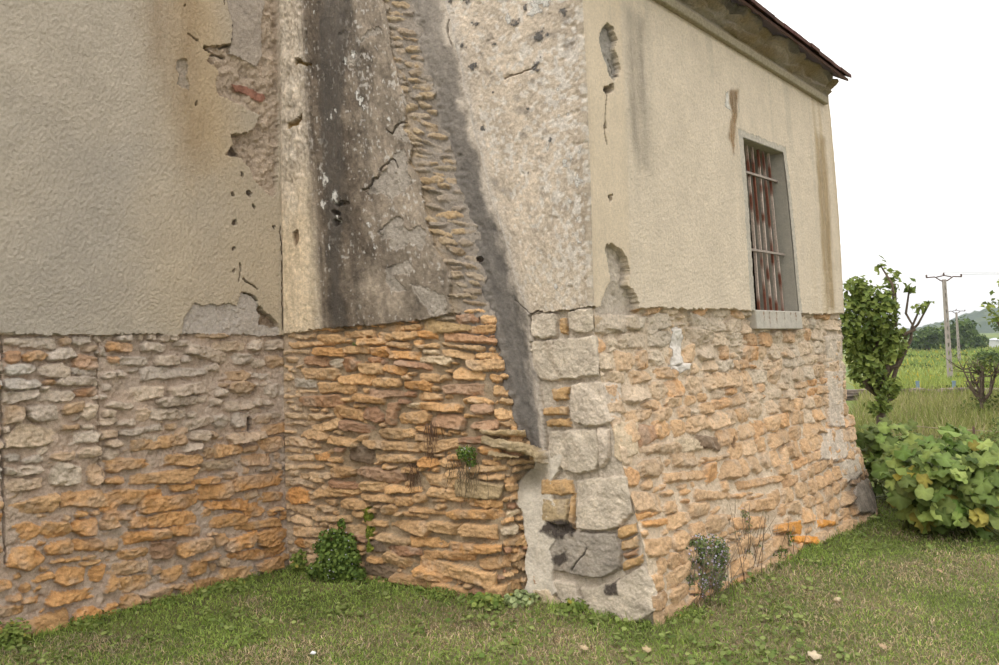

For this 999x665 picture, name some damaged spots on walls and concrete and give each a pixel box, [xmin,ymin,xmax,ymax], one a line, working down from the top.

spalling [176,58,191,90]
spalling [203,0,302,209]
spalling [599,22,621,94]
damp [320,0,350,325]
crack [363,158,399,191]
peeling [368,93,412,200]
spalling [182,291,280,336]
peeling [377,215,448,317]
spalling [594,243,640,315]